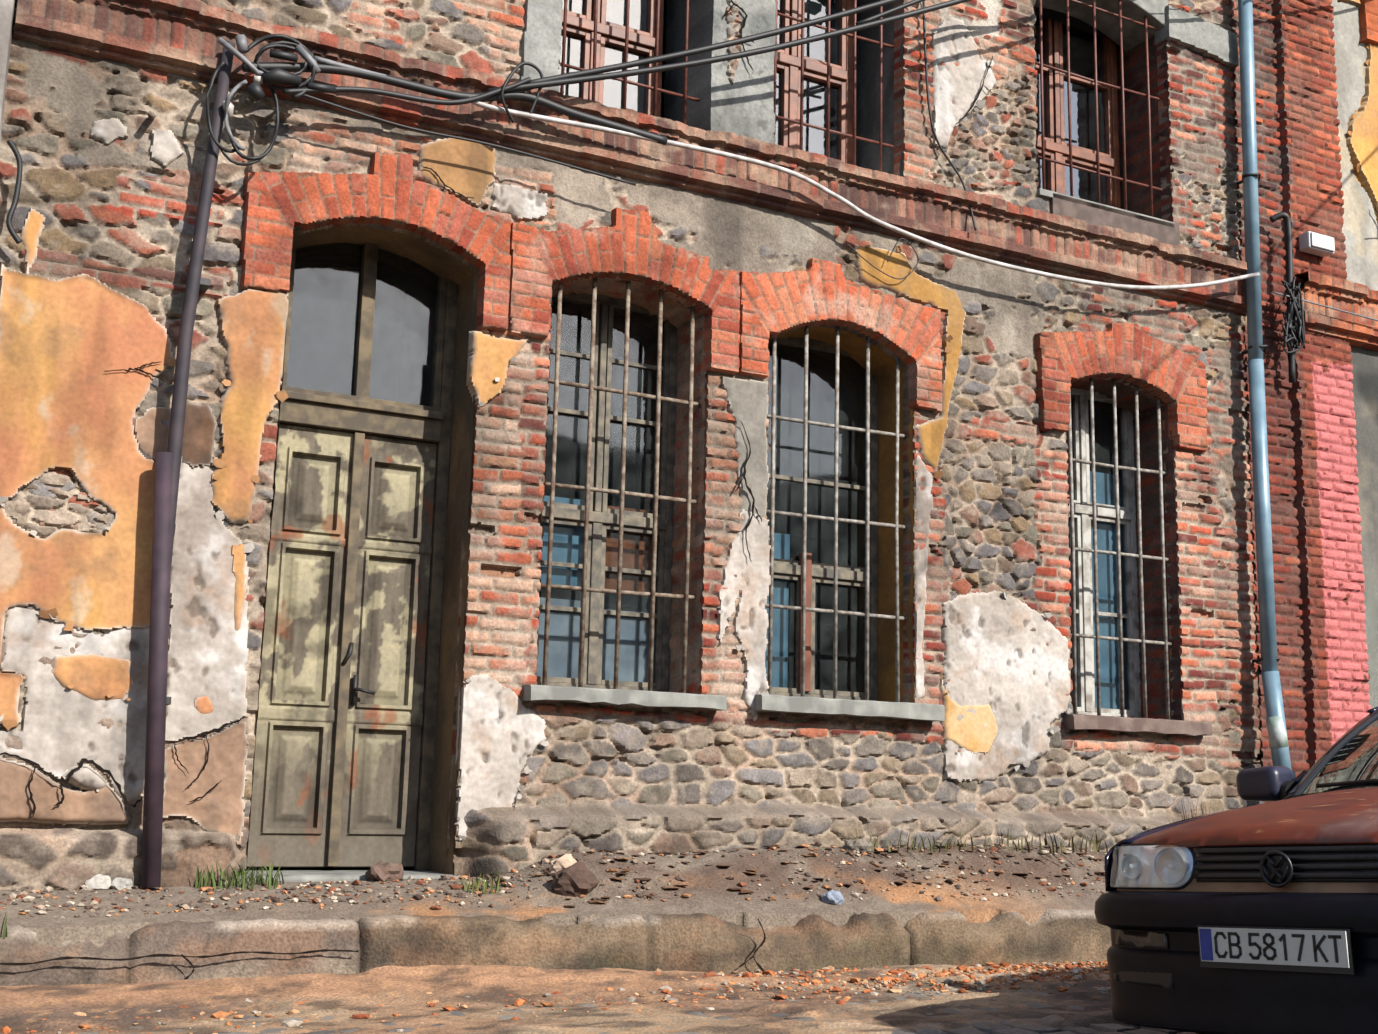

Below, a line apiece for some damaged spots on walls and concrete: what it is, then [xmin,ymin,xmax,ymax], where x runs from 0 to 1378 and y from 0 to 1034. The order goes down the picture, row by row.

crack [724,0,754,74]
flaking render [930,17,997,149]
flaking render [418,136,549,221]
spalling [1331,0,1378,291]
crack [104,361,166,382]
flaking render [0,207,289,801]
crack [735,421,762,562]
flaking render [852,244,1073,783]
crack [0,752,144,819]
crack [165,717,248,802]
crack [0,949,359,980]